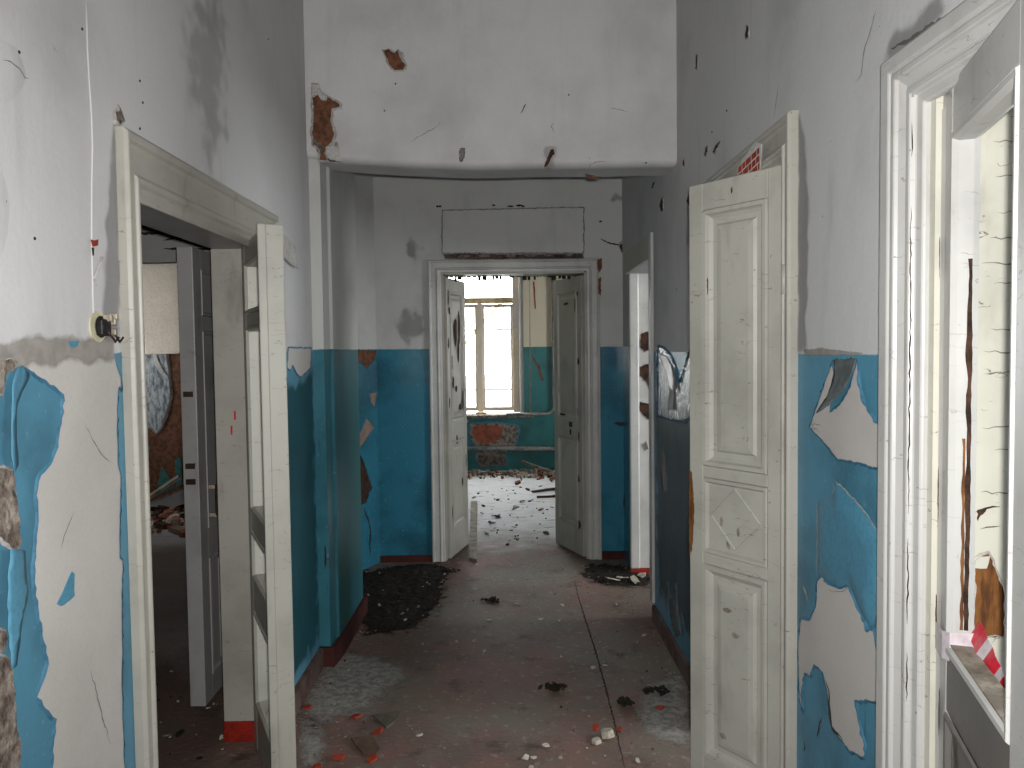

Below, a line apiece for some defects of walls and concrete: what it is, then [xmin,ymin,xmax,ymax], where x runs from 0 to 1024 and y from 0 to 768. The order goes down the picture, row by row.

spalling [382,48,407,72]
crack [858,12,945,79]
spalling [310,83,342,163]
spalling [145,353,184,503]
peeling [287,346,312,378]
spalling [360,391,377,505]
spalling [456,421,521,469]
peeling [639,331,690,423]
peeling [809,357,878,470]
peeling [0,356,126,768]
peeling [974,551,1006,638]
peeling [797,575,877,760]